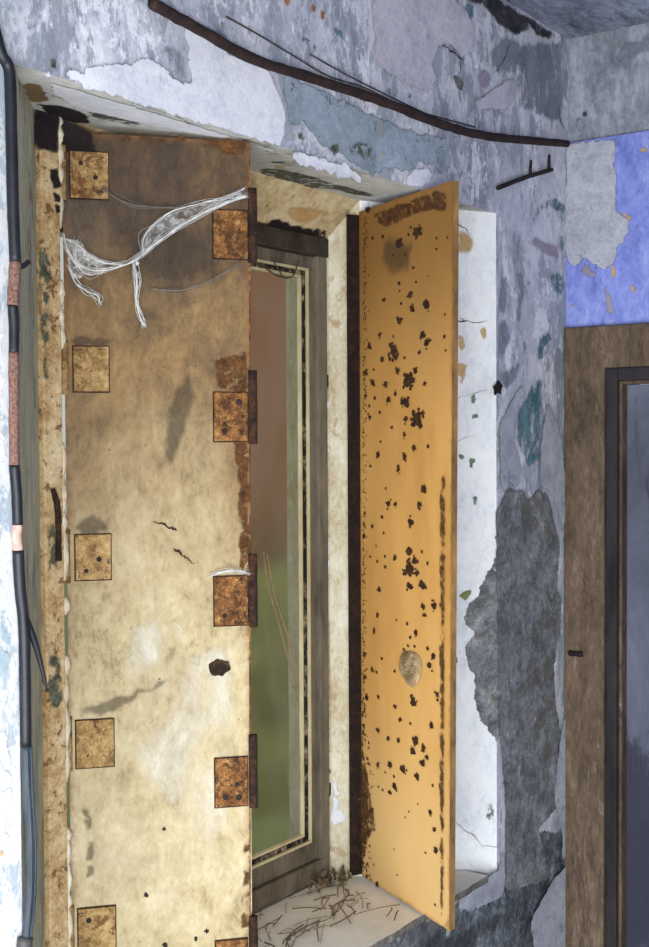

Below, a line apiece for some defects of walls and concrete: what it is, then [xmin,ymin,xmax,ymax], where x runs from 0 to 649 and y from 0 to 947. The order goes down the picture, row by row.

leakage [22,84,49,102]
peeling [533,139,631,314]
peeling [499,279,510,355]
peeling [538,334,551,359]
spalling [459,365,566,947]